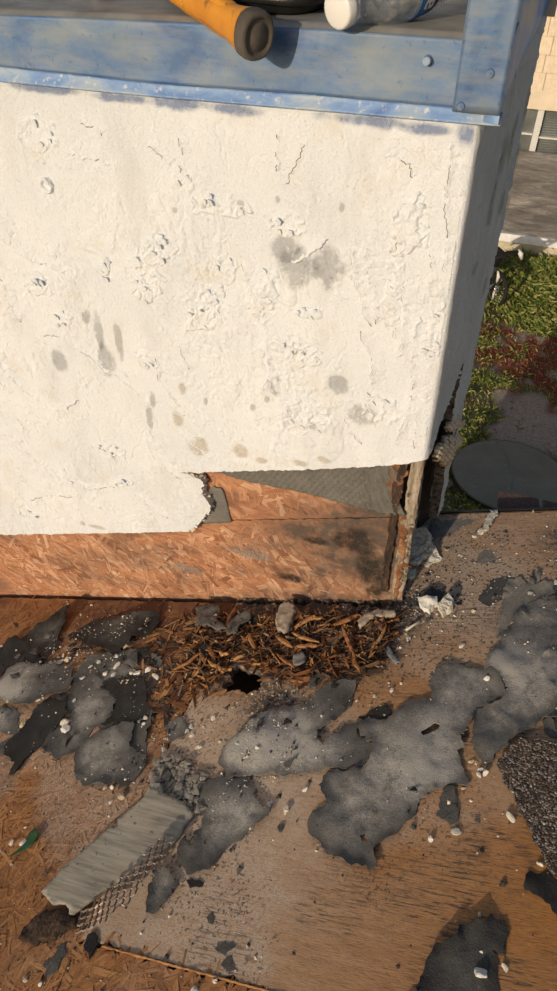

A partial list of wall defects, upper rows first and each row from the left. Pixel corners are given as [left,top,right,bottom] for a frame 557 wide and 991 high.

crack [275,135,316,189]
crack [241,258,301,428]
crack [287,142,467,449]